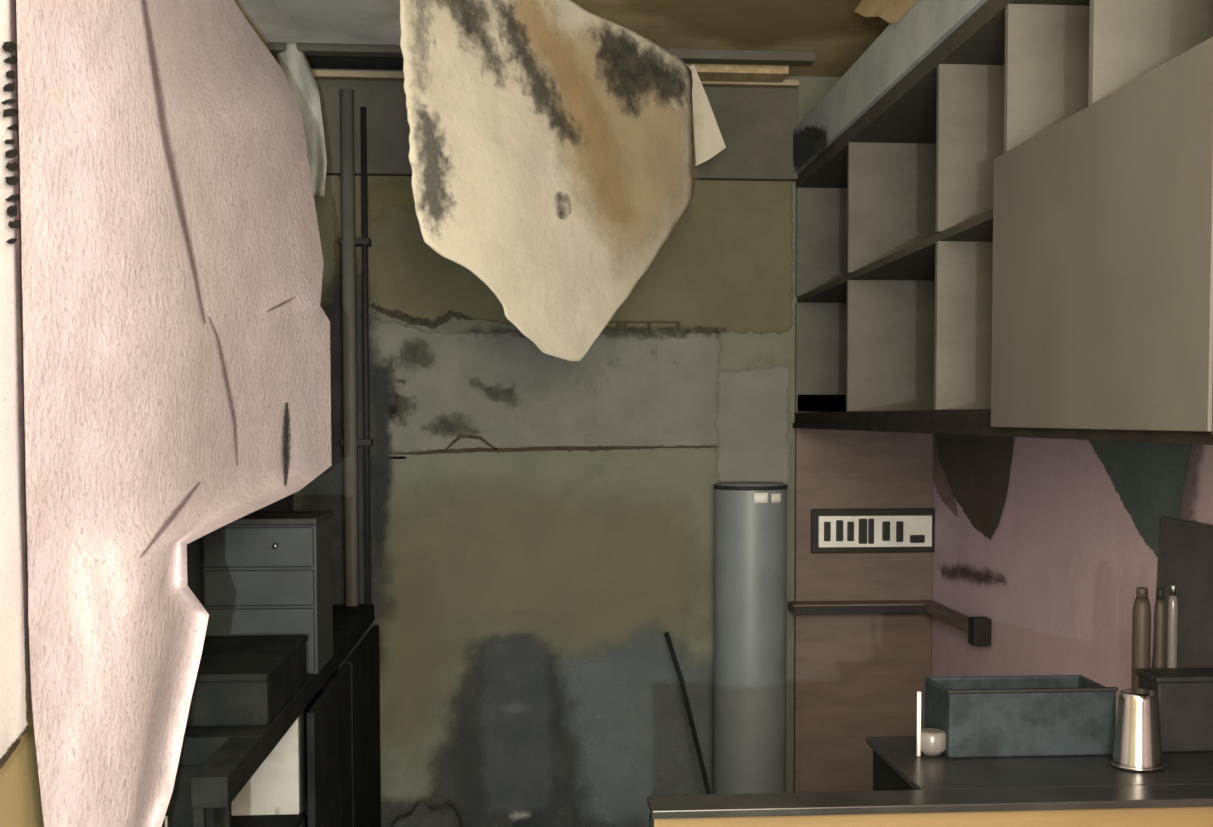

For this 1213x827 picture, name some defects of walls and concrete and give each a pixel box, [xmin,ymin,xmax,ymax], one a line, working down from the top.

damp [415,0,690,243]
damp [432,631,714,827]